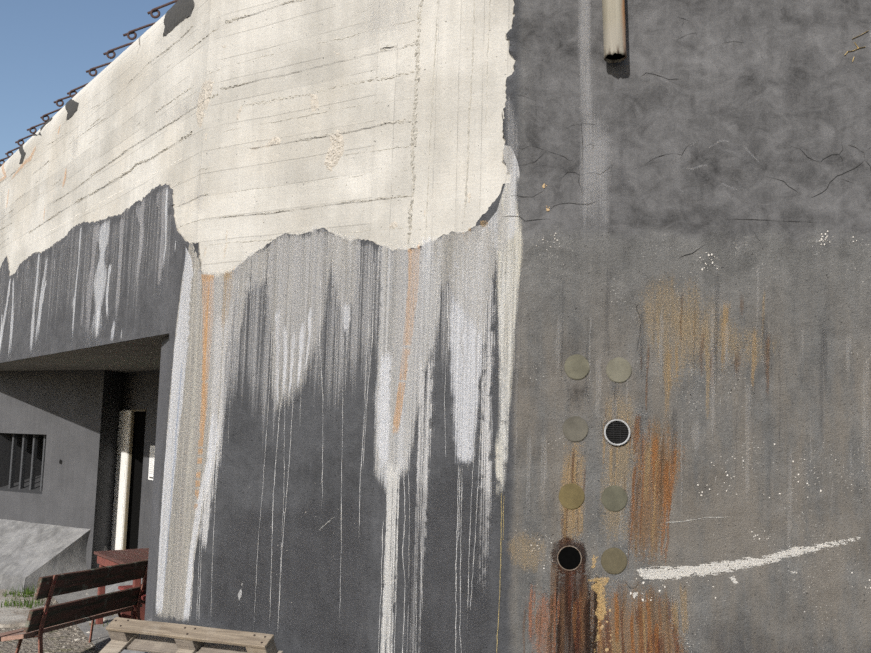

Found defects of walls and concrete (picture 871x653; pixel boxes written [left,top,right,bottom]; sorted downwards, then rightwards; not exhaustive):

flaking render [0,0,515,278]
crack [501,123,606,221]
crack [775,139,871,198]
damp [94,222,109,333]
damp [116,220,124,310]
corrosion [198,274,213,463]
damp [156,227,357,620]
corrosion [394,246,418,423]
damp [360,145,521,653]
corrosion [548,538,678,653]